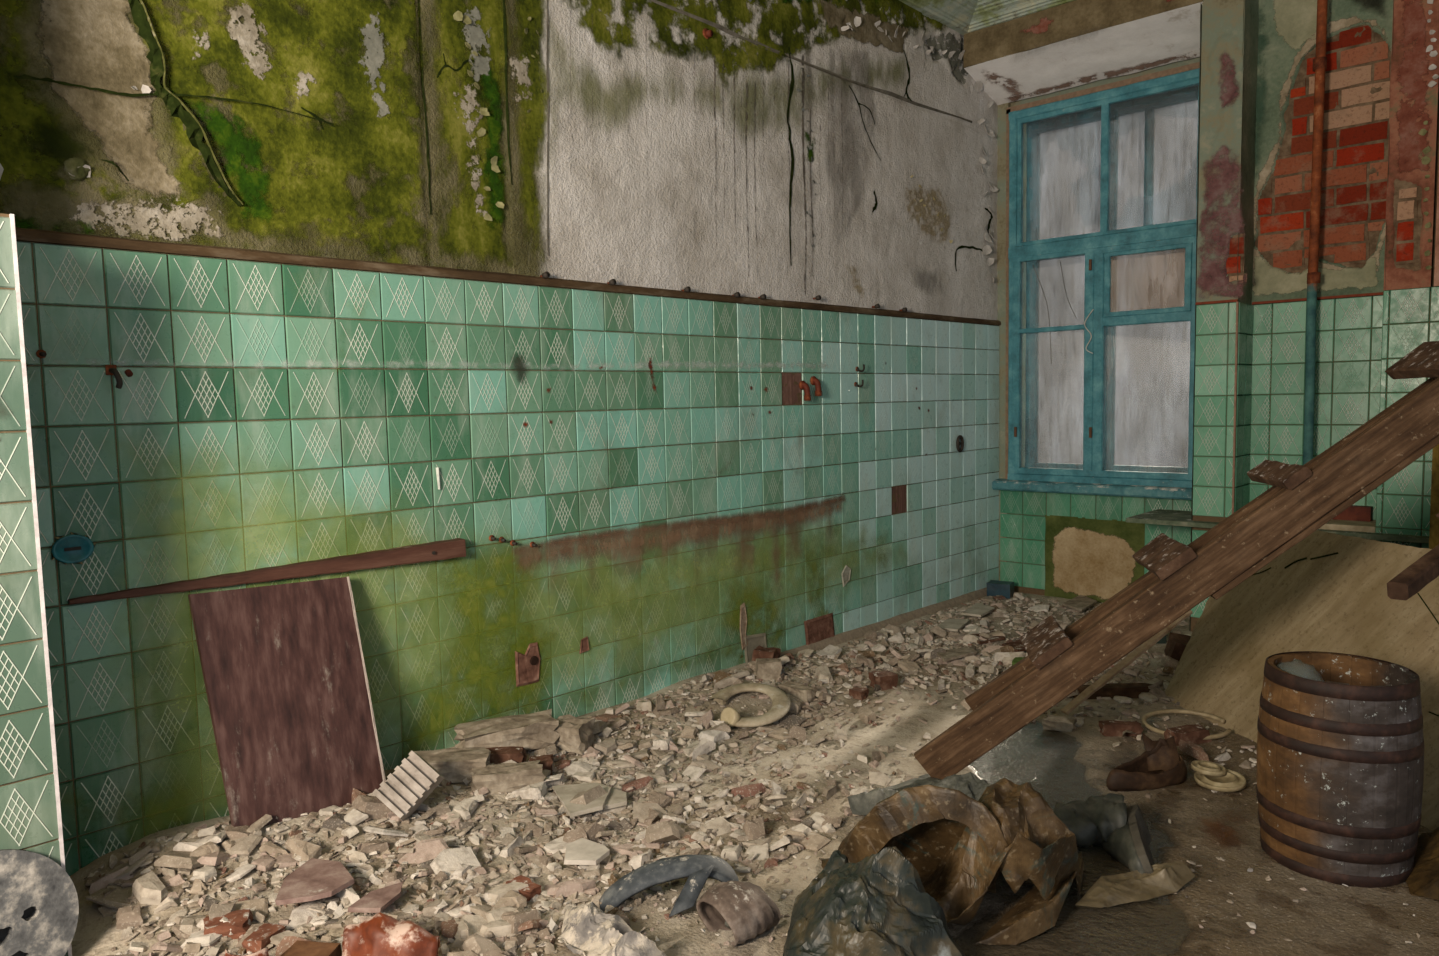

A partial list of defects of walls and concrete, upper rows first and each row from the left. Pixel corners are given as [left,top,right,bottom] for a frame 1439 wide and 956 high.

water stain [36,123,93,160]
flaking render [36,0,222,241]
crack [14,0,335,207]
crack [418,0,513,215]
crack [543,0,551,256]
water stain [714,57,764,257]
water stain [788,56,813,293]
crack [650,0,972,266]
flaking render [1197,0,1439,297]
corrosion [519,496,845,564]
peeling [892,485,907,514]
peeling [1045,515,1145,603]